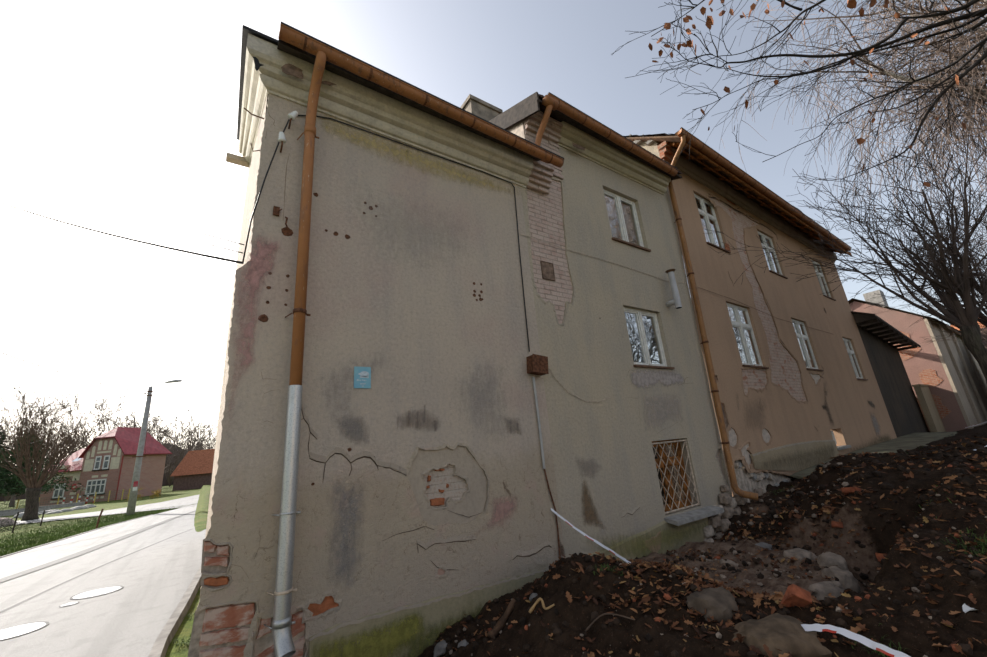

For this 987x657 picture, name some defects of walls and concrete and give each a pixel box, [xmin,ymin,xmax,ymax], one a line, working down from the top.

spalling [524,177,576,326]
spalling [707,195,821,404]
crack [301,407,407,480]
crack [383,510,480,570]
flaking render [407,442,490,526]
leakage [583,484,599,524]
spalling [188,538,276,657]
spalling [291,588,343,657]